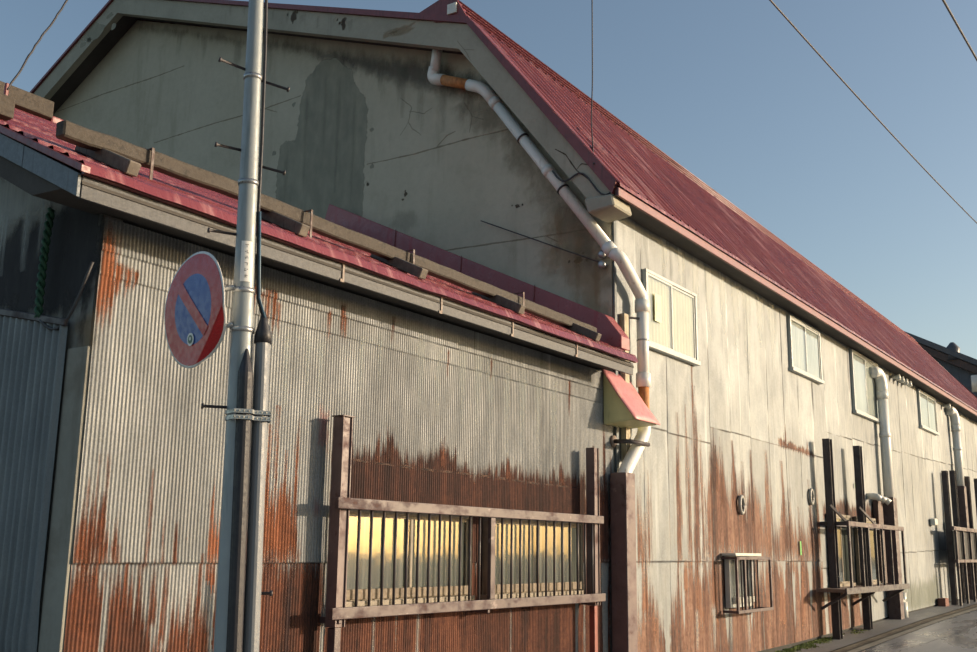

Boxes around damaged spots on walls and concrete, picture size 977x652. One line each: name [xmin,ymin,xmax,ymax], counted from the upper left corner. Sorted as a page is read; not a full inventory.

peeling [272,57,374,219]
damp [313,50,470,92]
rust [96,232,139,321]
rust [254,285,281,330]
rust [328,305,347,336]
rust [64,455,220,652]
rust [259,426,612,652]
rust [637,365,874,652]